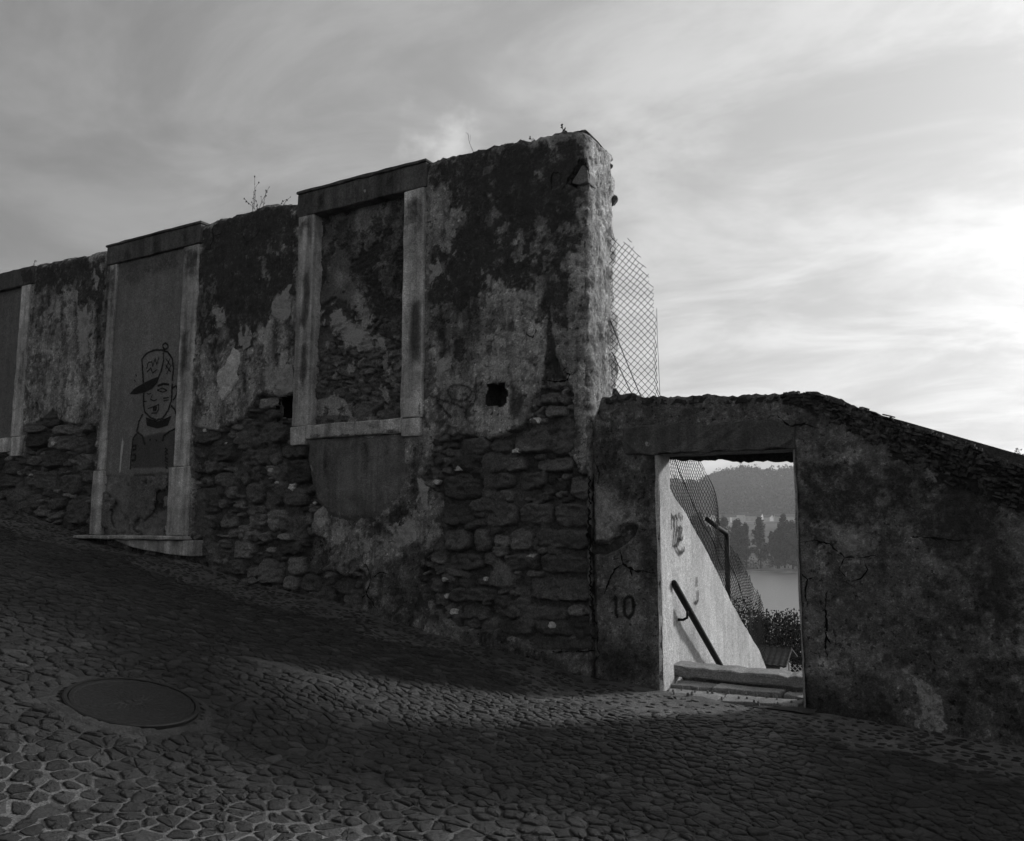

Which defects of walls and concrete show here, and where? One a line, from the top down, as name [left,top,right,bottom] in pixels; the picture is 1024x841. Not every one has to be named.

water stain [21,256,114,381]
flaking render [217,347,241,401]
water stain [184,206,309,395]
water stain [427,135,594,381]
spalling [0,410,169,540]
spalling [193,393,363,609]
spalling [420,382,638,653]
crack [552,461,654,661]
crack [800,539,875,656]